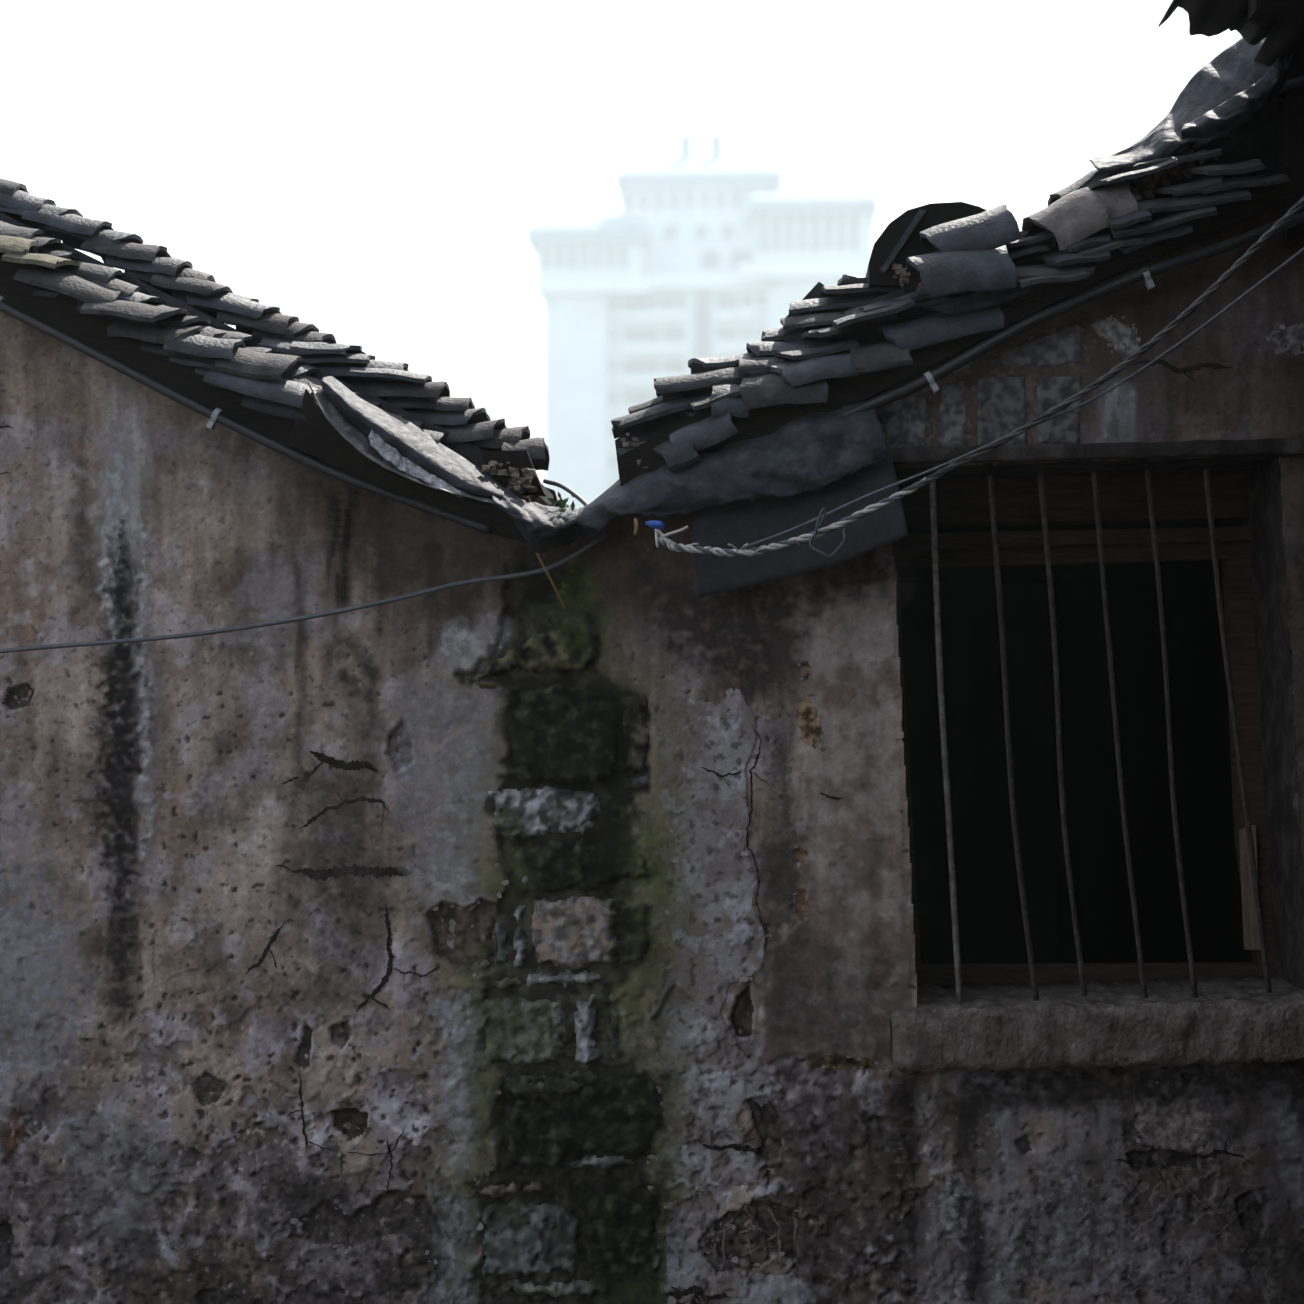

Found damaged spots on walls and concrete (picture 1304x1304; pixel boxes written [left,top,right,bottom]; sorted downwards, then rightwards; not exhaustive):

flaking render [1265,321,1304,355]
leakage [90,389,157,1002]
flaking render [795,659,825,750]
crack [282,751,390,833]
crack [701,718,774,968]
crack [245,925,283,975]
crack [276,863,455,1012]
flaking render [428,608,801,1304]
flaking render [806,1054,877,1070]